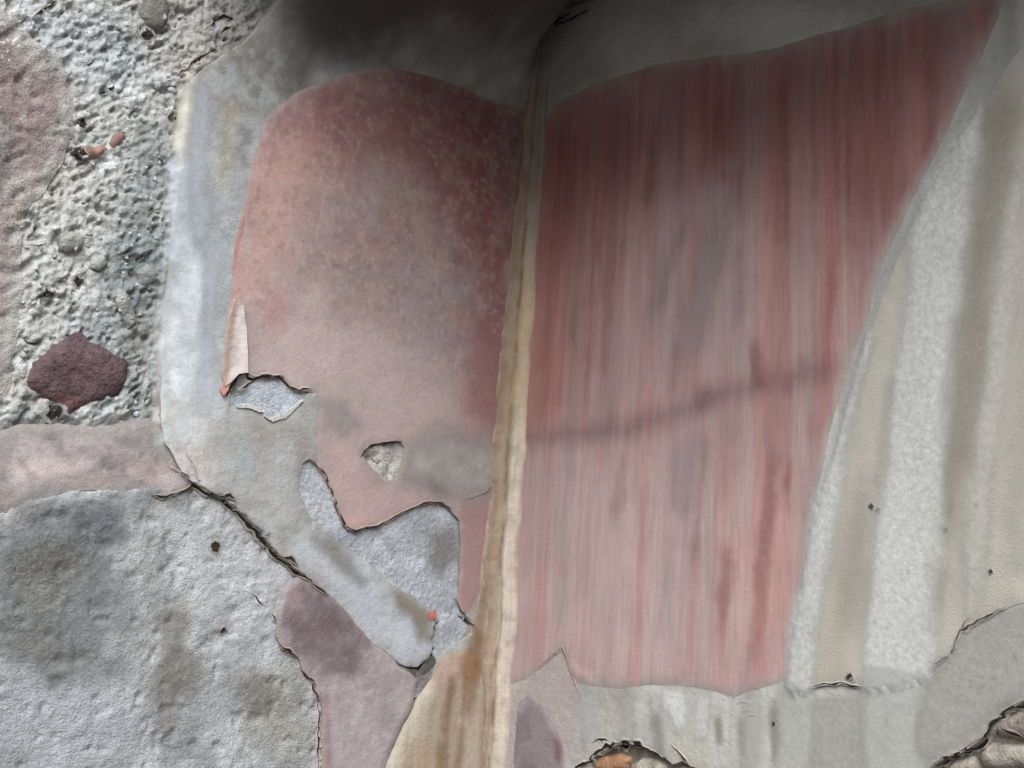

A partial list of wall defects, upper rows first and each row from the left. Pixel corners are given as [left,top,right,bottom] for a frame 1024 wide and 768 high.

spalling [220,299,307,422]
spalling [362,442,403,482]
crack [151,452,331,599]
spalling [298,460,468,698]
crack [931,605,1005,679]